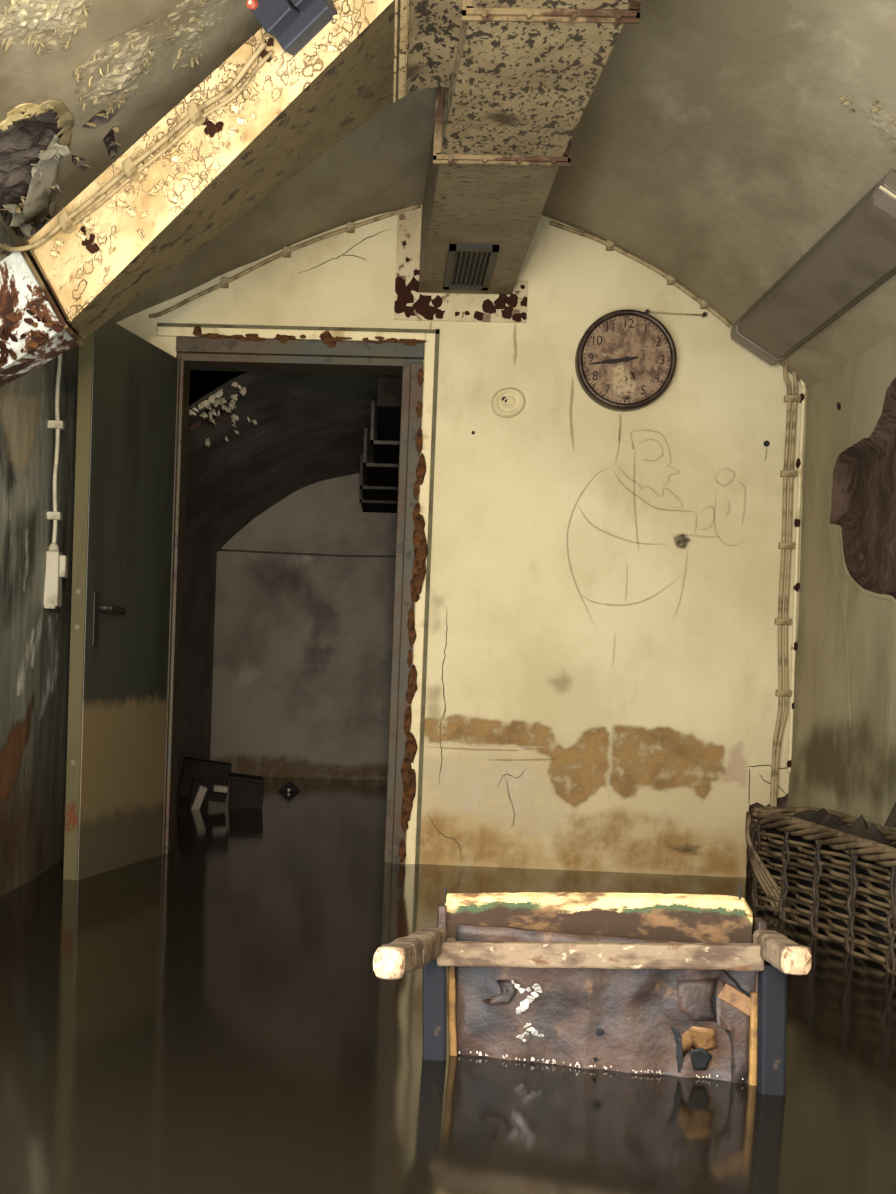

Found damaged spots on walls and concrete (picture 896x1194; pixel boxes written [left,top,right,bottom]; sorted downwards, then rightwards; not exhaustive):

peeling [0,0,229,261]
rust [394,241,527,322]
rust [0,309,63,366]
rust [193,325,428,348]
damp [0,389,39,491]
peeling [188,382,258,448]
damp [3,512,36,615]
flaking render [829,377,896,725]
damp [18,616,51,695]
rust [398,401,428,863]
crack [427,812,461,858]
crack [497,770,525,827]